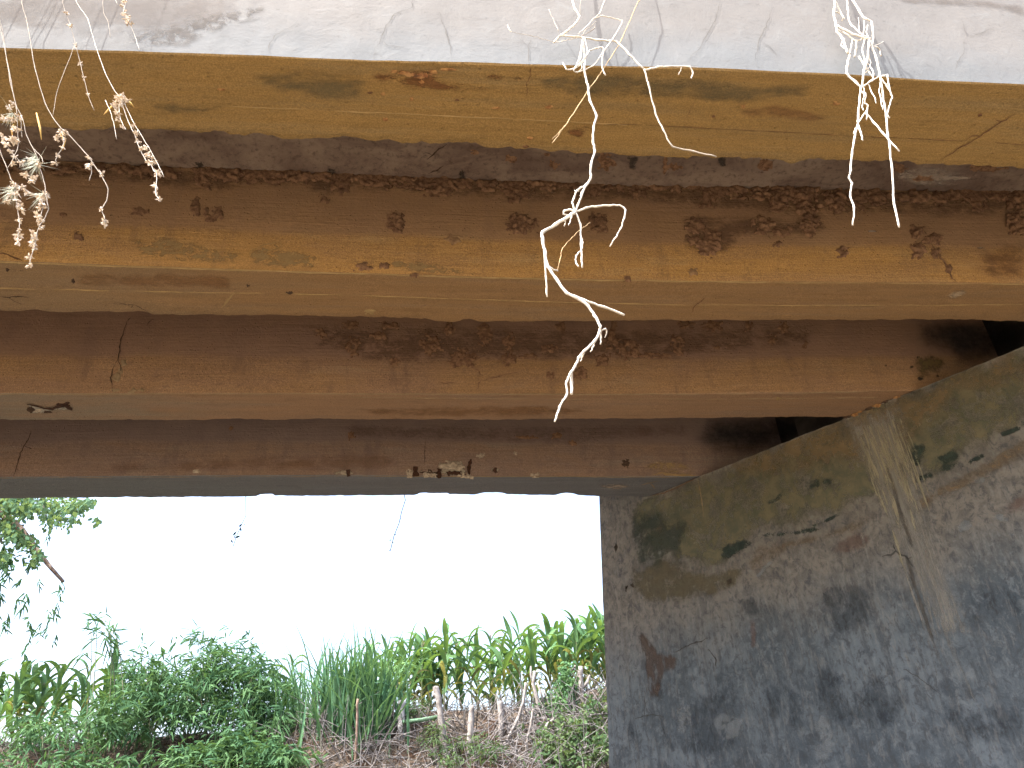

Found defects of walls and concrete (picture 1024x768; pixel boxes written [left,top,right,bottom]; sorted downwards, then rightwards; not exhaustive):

crack [110,303,153,395]
spalling [27,402,72,413]
spalling [406,453,485,479]
water stain [634,538,814,600]
corrosion [640,634,676,696]